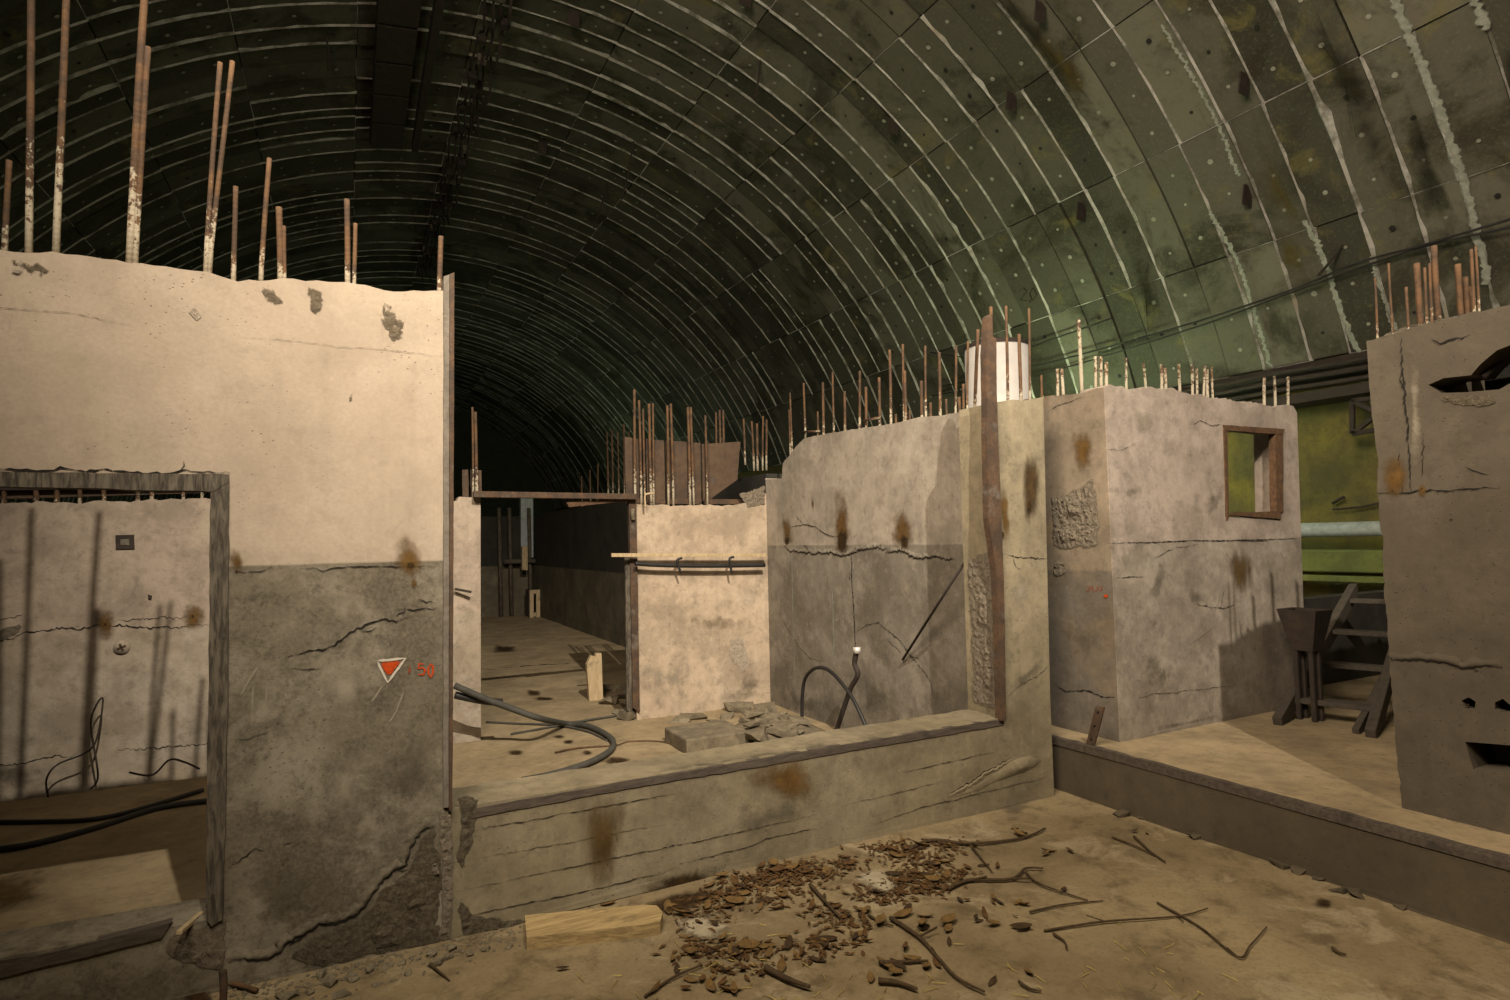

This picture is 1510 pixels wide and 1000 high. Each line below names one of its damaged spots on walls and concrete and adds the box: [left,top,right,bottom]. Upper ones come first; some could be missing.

spalling [1,0,70,276]
spalling [258,157,287,303]
spalling [307,288,323,313]
spalling [380,303,404,341]
crack [1377,335,1500,494]
corrosion [836,507,847,551]
corrosion [895,514,910,547]
corrosion [1025,463,1038,512]
crack [231,565,436,670]
crack [783,516,991,698]
crack [224,817,435,963]
corrosion [590,814,616,868]